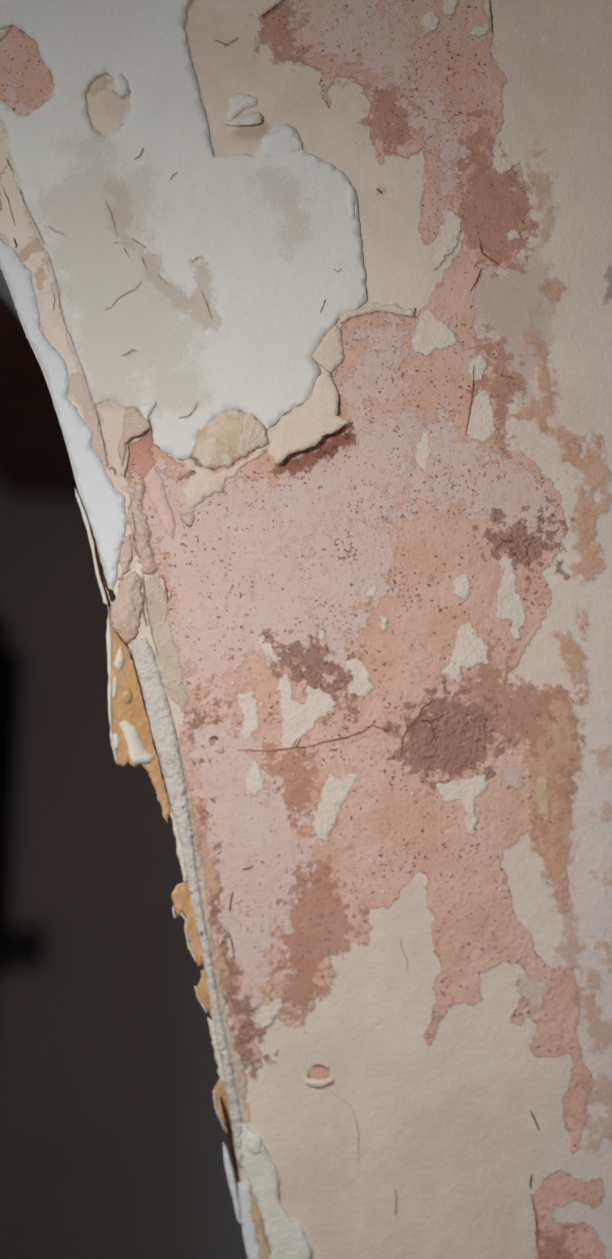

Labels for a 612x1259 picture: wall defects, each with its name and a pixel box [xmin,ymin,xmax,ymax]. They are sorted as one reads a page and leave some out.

peeling [0,26,55,116]
peeling [86,73,131,138]
peeling [0,169,115,475]
peeling [117,0,592,1154]
crack [238,700,443,759]
peeling [531,1170,606,1259]